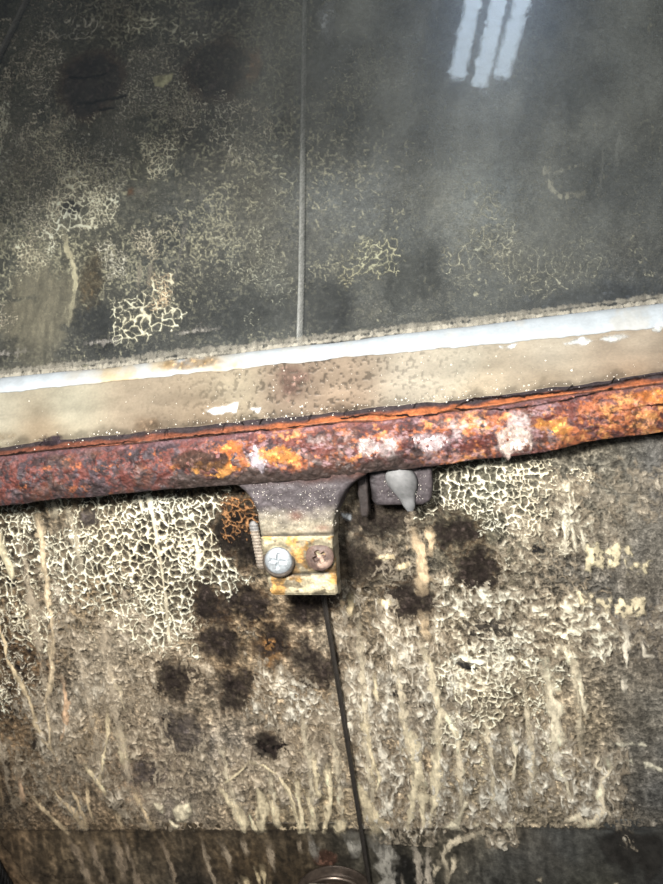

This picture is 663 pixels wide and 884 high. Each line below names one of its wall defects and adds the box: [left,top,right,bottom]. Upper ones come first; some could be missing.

corrosion [0,371,663,506]
damp [398,531,435,586]
damp [0,524,71,747]
damp [52,641,128,825]
damp [220,731,346,833]
damp [357,657,382,824]
damp [392,656,443,825]
damp [427,658,465,803]
damp [544,677,563,754]
damp [622,635,651,664]
damp [376,834,476,884]
damp [600,830,662,880]